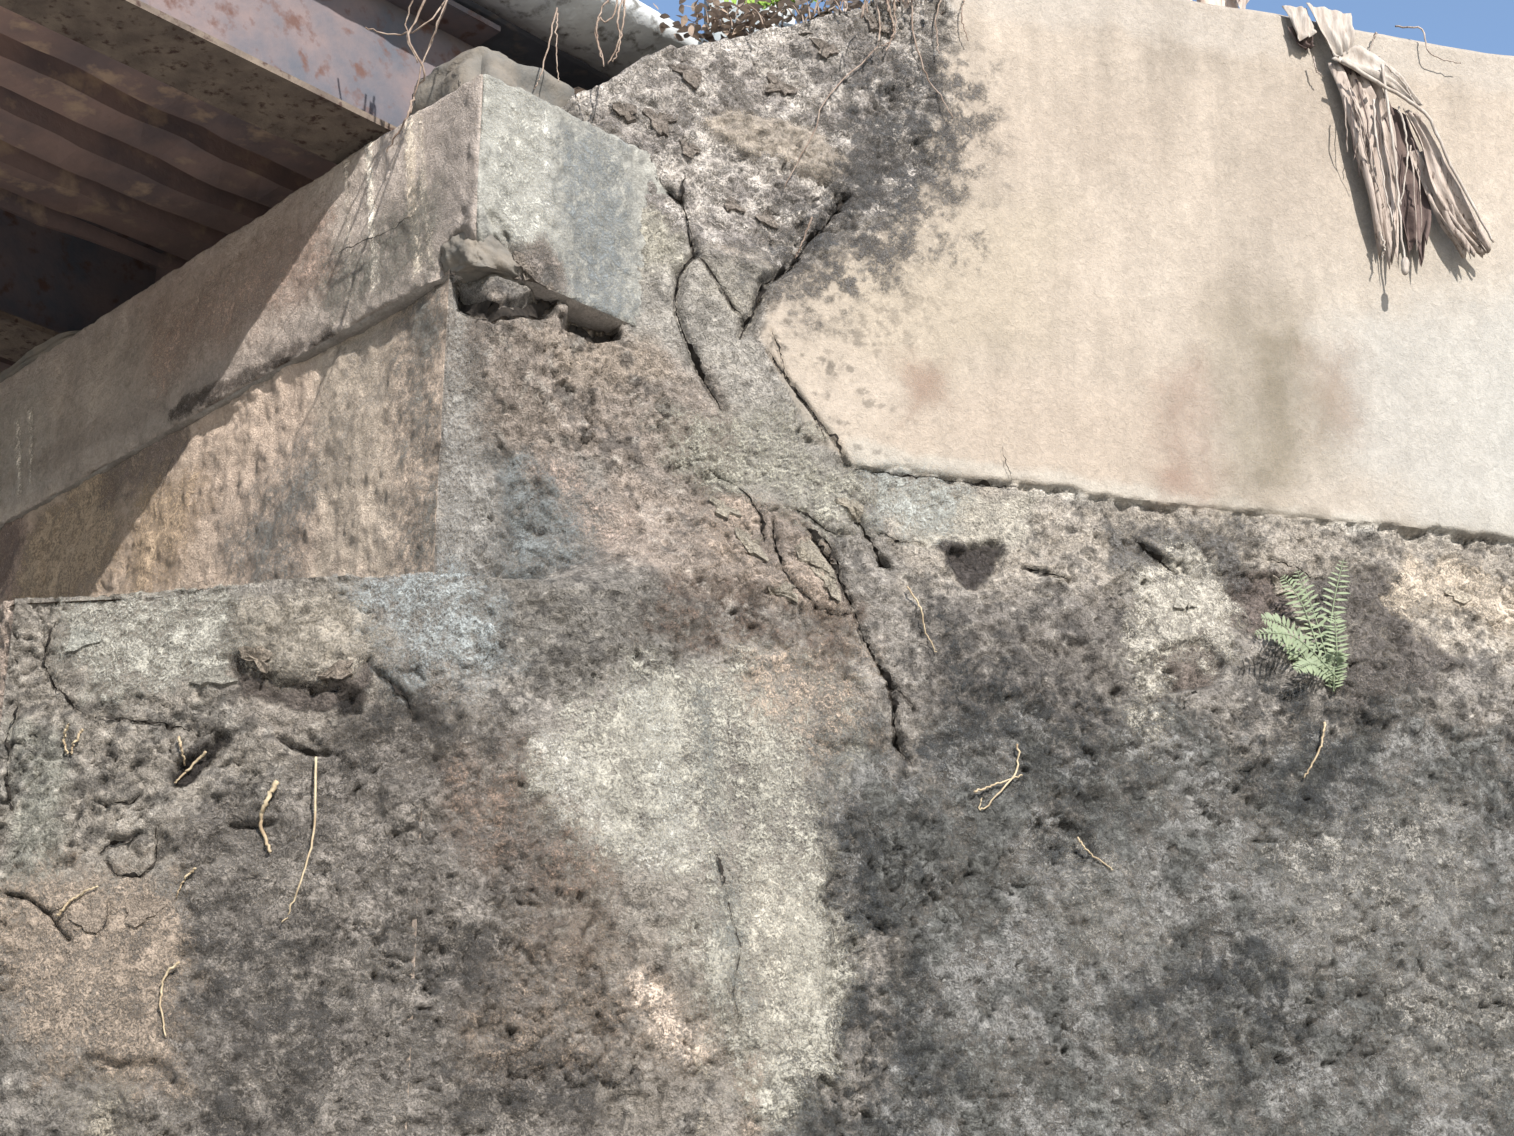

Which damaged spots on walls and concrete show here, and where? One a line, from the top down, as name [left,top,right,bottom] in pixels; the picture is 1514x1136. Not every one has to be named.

damp [222,83,634,684]
spalling [440,232,566,292]
crack [655,177,1026,489]
damp [738,41,1000,328]
crack [4,707,19,809]
crack [7,795,158,938]
crack [41,622,193,732]
crack [711,471,924,763]
spalling [773,538,1514,1136]
damp [1102,513,1248,591]